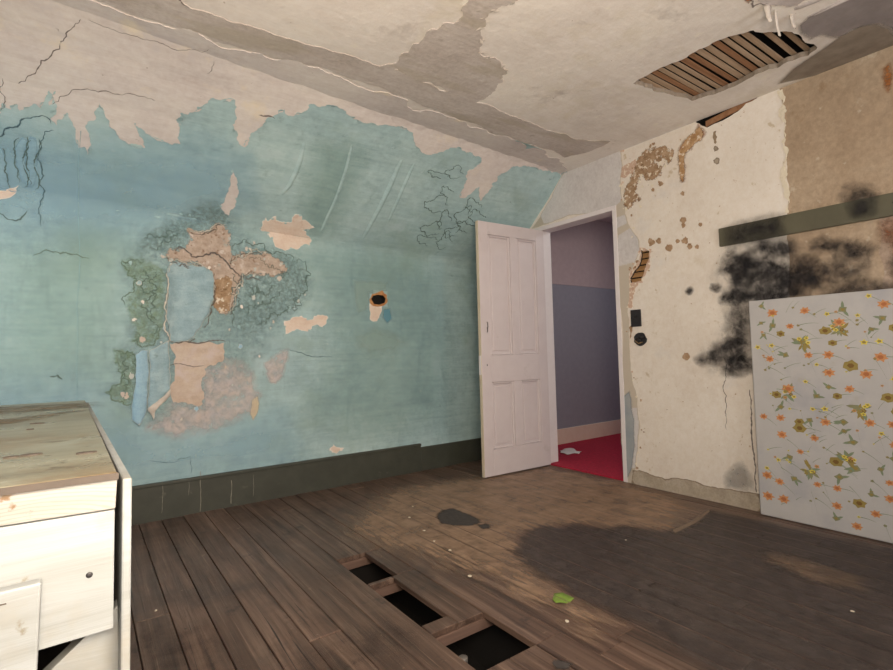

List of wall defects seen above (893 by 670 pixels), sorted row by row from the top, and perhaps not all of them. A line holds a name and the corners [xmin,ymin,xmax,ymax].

crack [0,19,213,225]
flaking render [155,339,259,434]
flaking render [160,170,315,327]
peeling [0,0,611,201]
peeling [283,315,329,334]
spalling [369,291,391,323]
flaking render [619,142,674,216]
spalling [633,45,817,101]
water stain [699,220,886,375]
flaking render [777,46,893,214]
flaking render [787,216,893,298]
water stain [516,510,893,670]